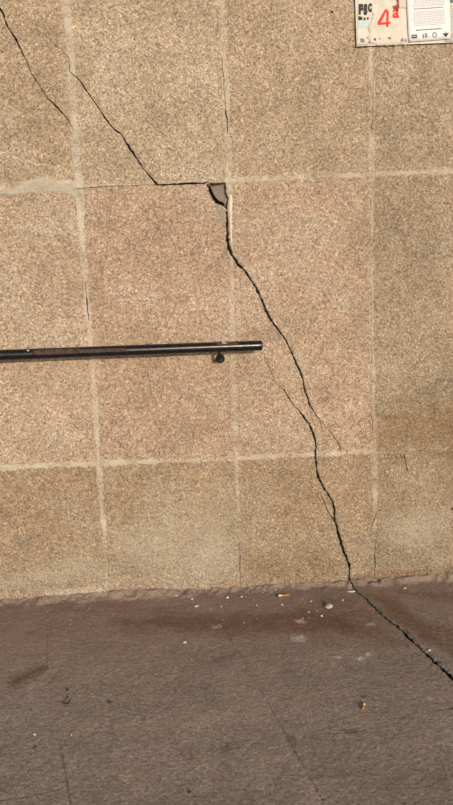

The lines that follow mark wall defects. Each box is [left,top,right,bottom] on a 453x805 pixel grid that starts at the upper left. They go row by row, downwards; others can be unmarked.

crack [0,6,74,132]
crack [37,30,211,190]
crack [221,58,229,133]
spalling [205,182,229,227]
crack [83,283,91,320]
crack [223,195,355,587]
crack [369,503,377,578]